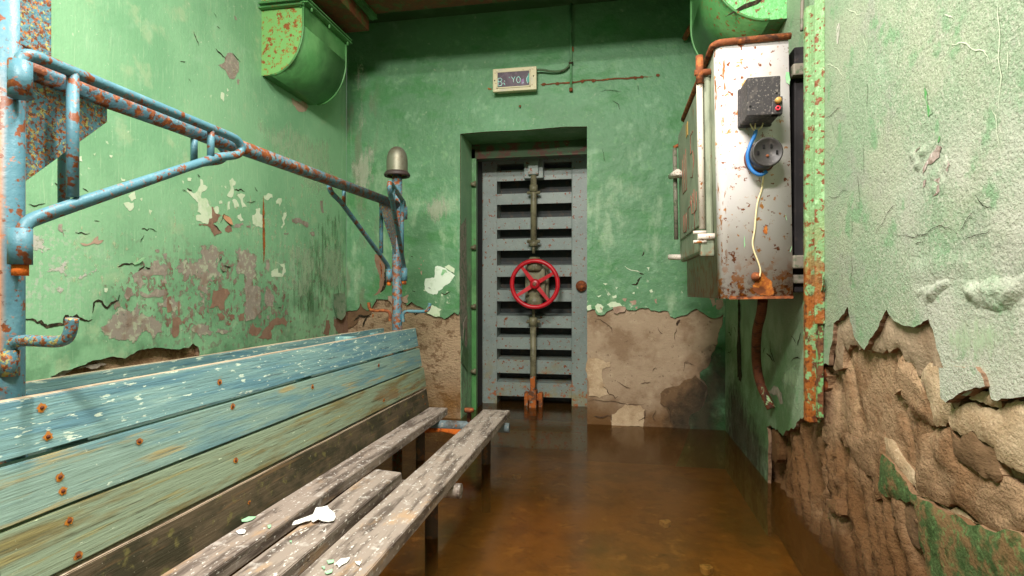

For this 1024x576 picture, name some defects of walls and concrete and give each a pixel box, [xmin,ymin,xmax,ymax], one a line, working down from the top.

corrosion [540,74,660,86]
crack [26,295,120,328]
flaking render [47,178,315,377]
flaking render [323,218,469,453]
flaking render [586,283,723,466]
damp [671,355,763,484]
corrosion [824,366,838,392]
flaking render [768,314,1024,576]